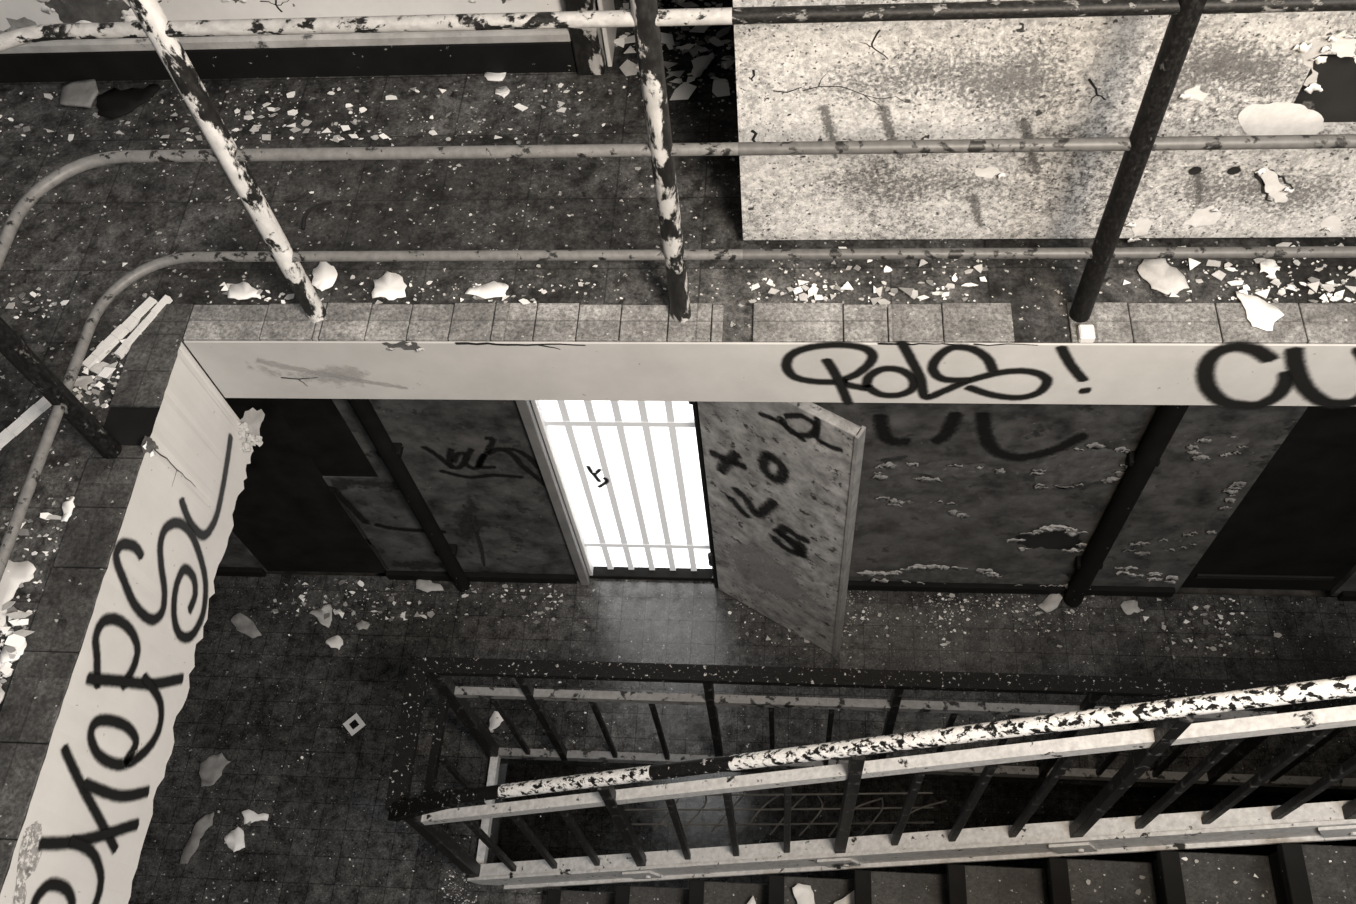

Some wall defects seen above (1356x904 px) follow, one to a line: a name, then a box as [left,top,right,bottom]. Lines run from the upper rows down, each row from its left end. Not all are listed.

peeling [0,0,139,34]
spalling [1293,30,1356,94]
peeling [227,282,261,300]
peeling [312,262,338,291]
peeling [1007,524,1088,554]
peeling [0,640,27,704]